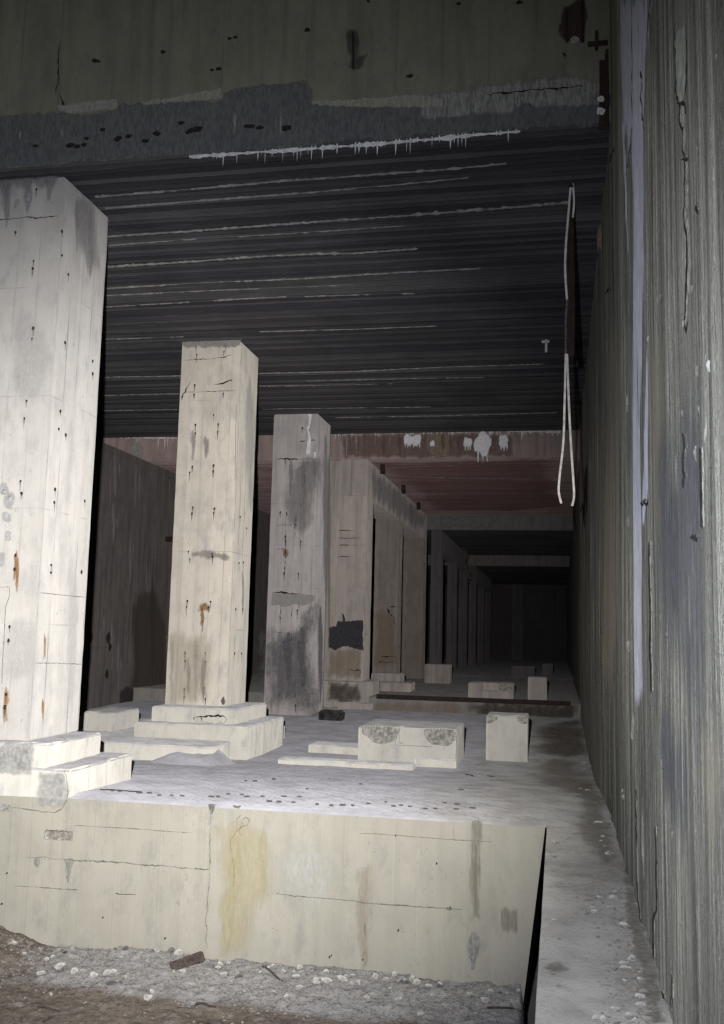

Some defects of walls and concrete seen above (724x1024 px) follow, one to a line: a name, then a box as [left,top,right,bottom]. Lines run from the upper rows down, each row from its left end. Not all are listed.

peeling [58,99,118,114]
peeling [312,94,443,108]
water stain [0,76,605,217]
crack [674,22,700,333]
crack [181,355,236,398]
water stain [372,430,561,526]
water stain [264,407,429,712]
peeling [328,613,364,650]
crack [193,714,227,724]
spalling [362,725,400,744]
spalling [424,728,457,746]
crack [1,770,250,948]